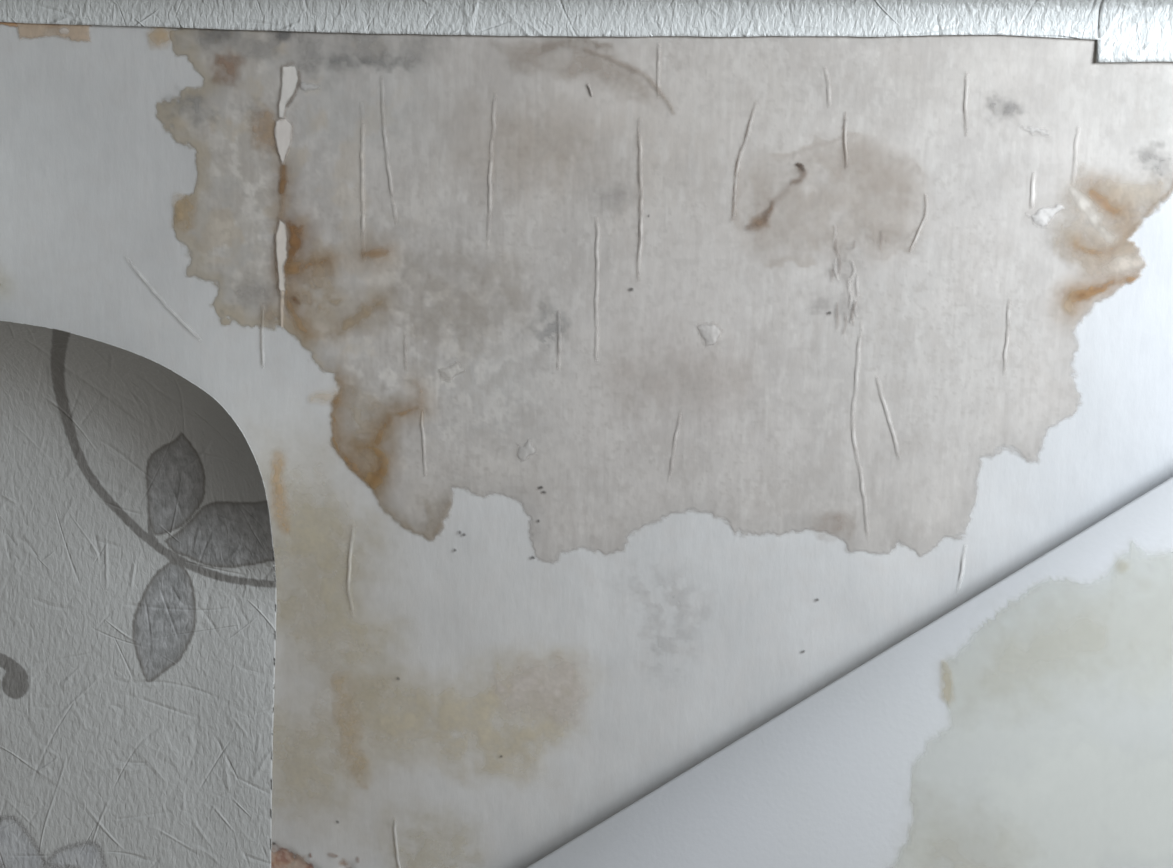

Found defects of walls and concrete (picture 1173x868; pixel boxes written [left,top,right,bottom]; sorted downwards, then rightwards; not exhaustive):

damp [150,28,1173,562]
flaking render [271,848,313,868]
damp [895,544,1173,868]